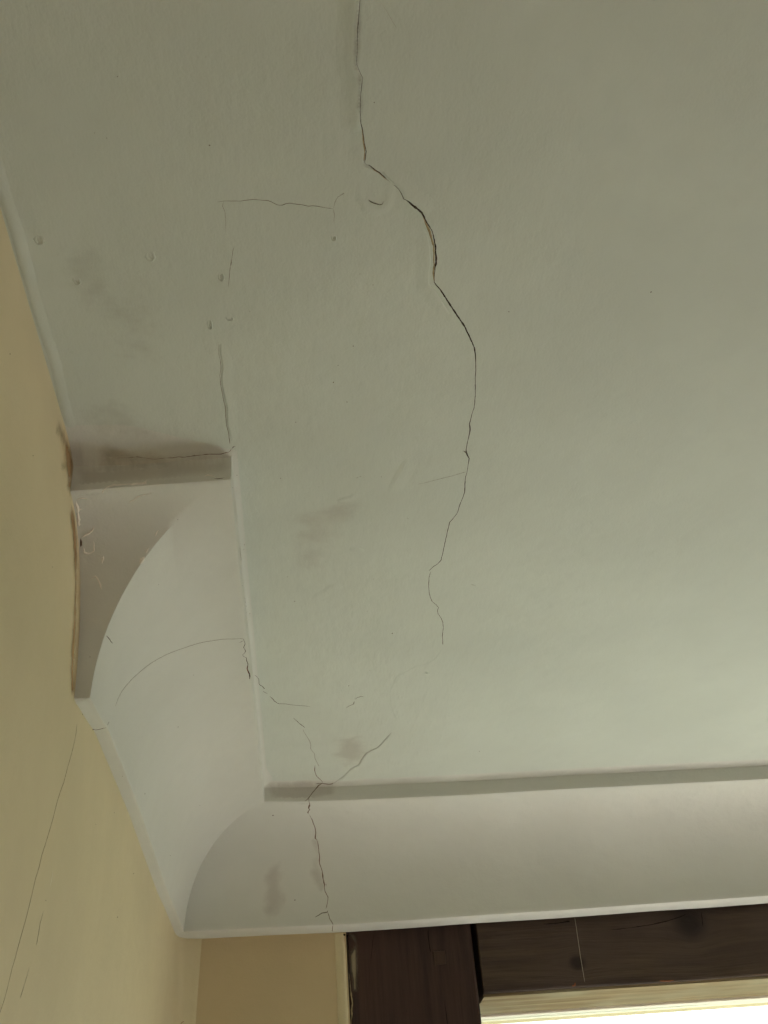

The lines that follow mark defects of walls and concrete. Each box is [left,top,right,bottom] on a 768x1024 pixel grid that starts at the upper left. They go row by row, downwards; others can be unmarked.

crack [219,0,476,643]
crack [116,638,333,932]